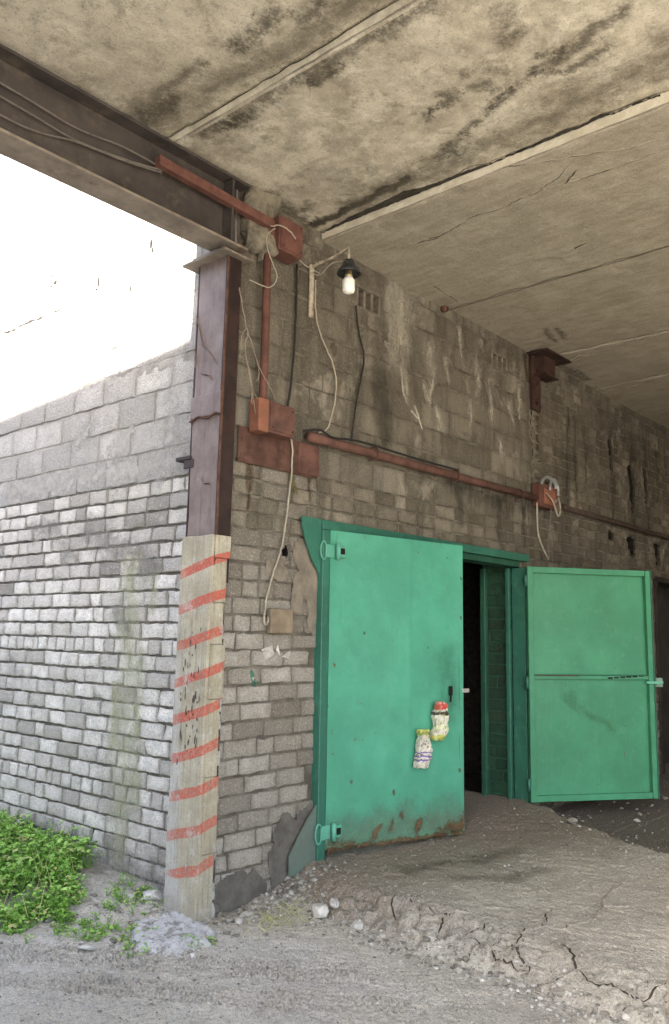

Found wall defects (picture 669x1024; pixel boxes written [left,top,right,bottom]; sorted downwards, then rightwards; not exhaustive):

leakage [201,19,404,135]
crack [378,136,669,250]
leakage [372,365,391,446]
leakage [386,282,449,430]
rust [326,816,464,855]